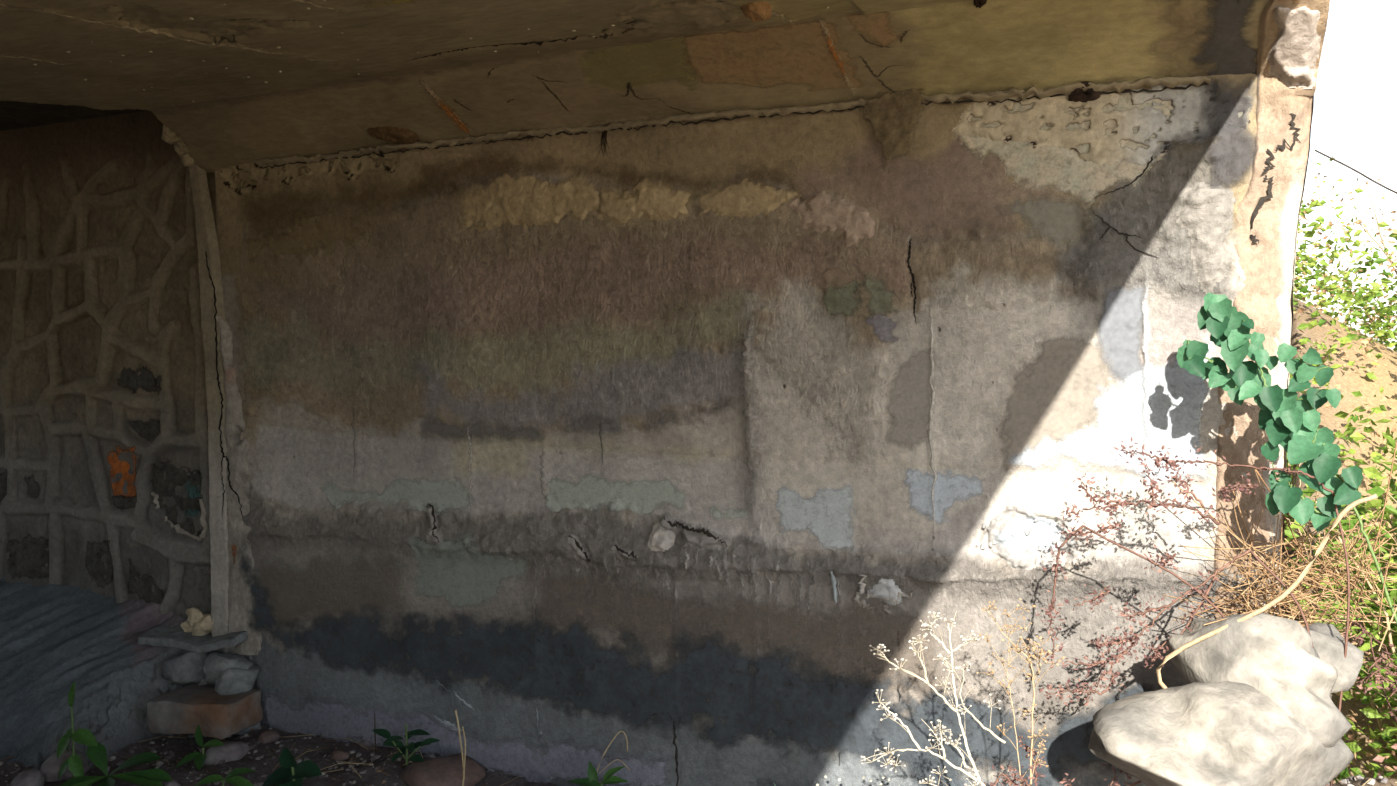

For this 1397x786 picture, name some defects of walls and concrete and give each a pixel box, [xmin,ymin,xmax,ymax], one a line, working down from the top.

crack [1093,156,1158,258]
water stain [809,268,899,342]
crack [907,238,917,324]
crack [205,251,244,527]
water stain [422,417,540,441]
spalling [608,512,731,564]
flaking render [853,575,914,614]
water stain [241,535,1151,786]